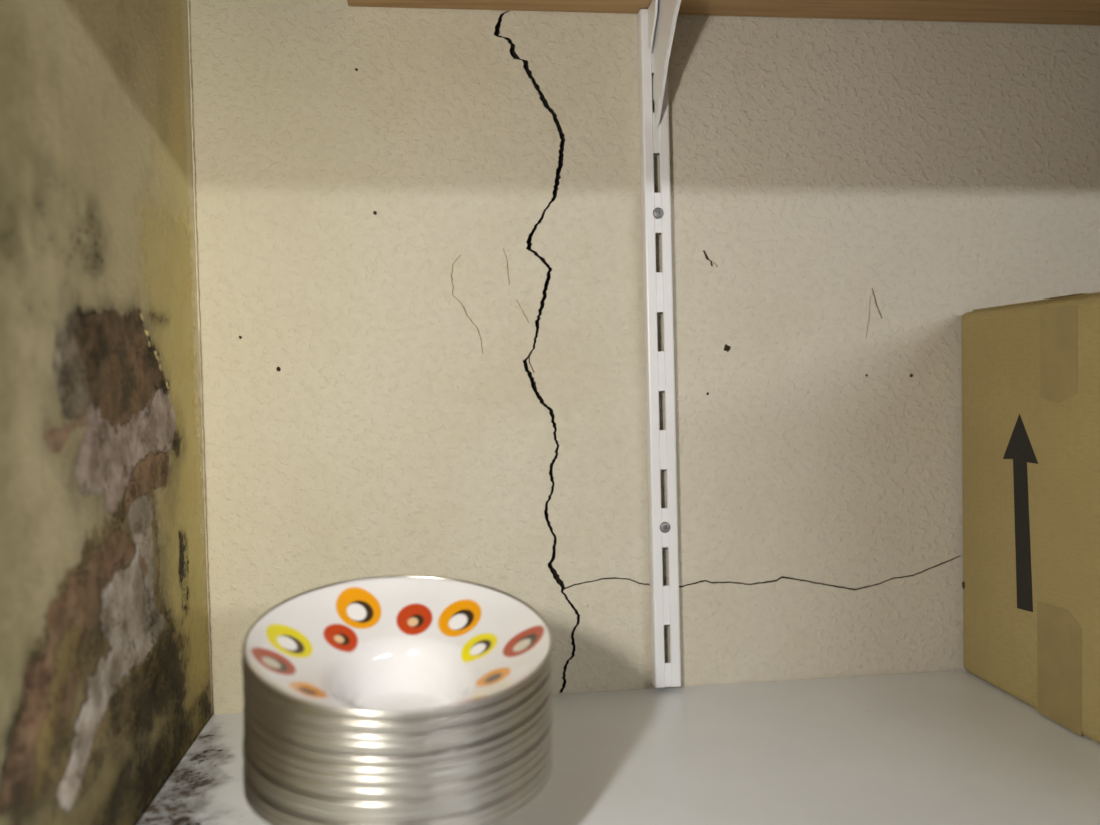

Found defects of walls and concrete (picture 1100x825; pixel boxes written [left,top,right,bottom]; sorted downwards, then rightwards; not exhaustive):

leakage [66,306,170,407]
crack [451,255,483,354]
crack [494,11,650,693]
crack [866,288,882,337]
peeling [0,308,183,821]
crack [679,555,961,591]
leakage [79,531,229,825]